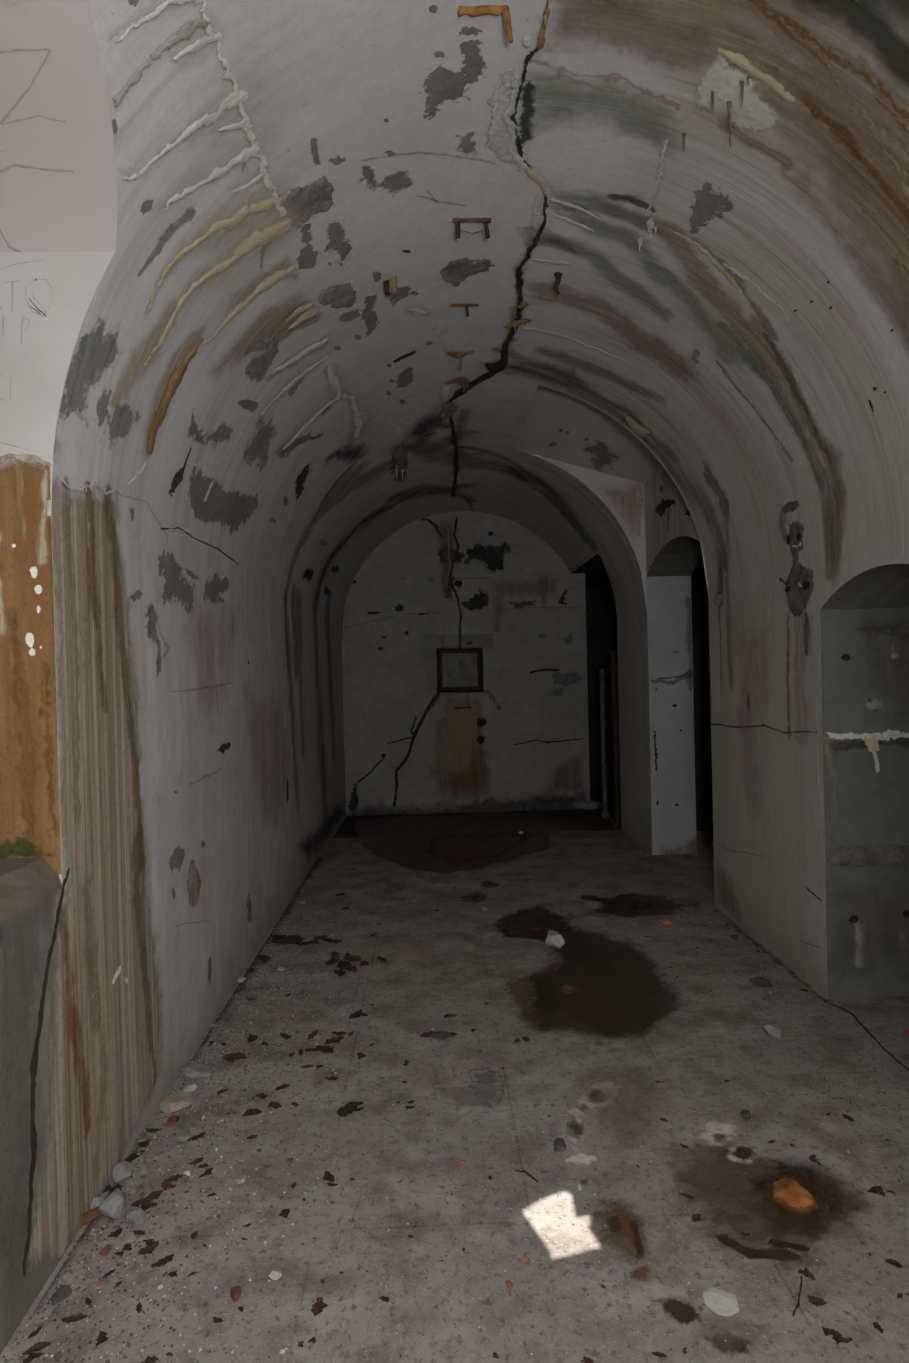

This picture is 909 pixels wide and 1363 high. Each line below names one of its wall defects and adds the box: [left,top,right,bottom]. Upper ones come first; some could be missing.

rust [0,454,61,875]
leakage [60,0,296,447]
peeling [131,548,232,676]
peeling [188,466,258,535]
crack [348,690,441,812]
peeling [419,26,487,120]
crack [420,48,550,649]
rust [522,0,552,49]
rust [574,206,844,578]
leakage [695,0,909,284]
leakage [824,730,909,839]
crack [23,868,70,1276]